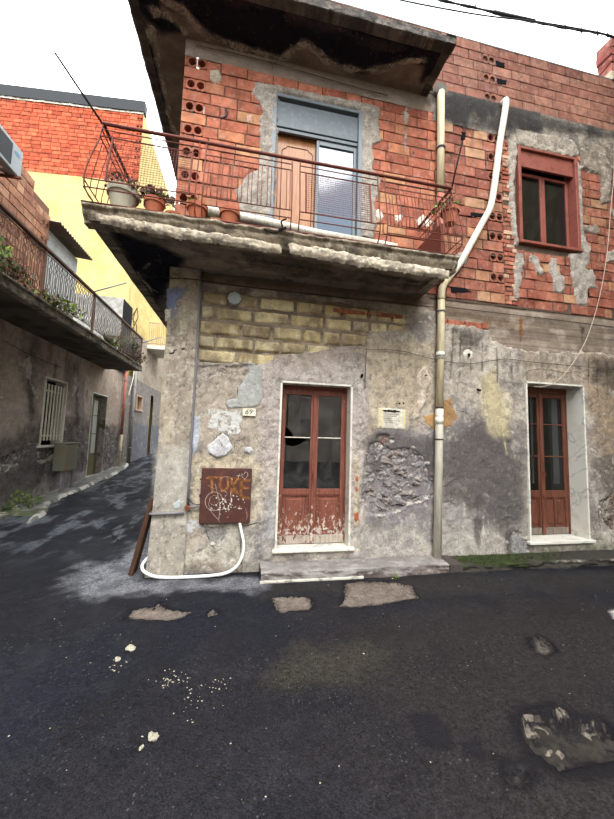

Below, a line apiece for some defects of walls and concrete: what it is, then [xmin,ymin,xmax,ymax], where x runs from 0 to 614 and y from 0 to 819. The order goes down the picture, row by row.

spalling [95,213,471,293]
spalling [197,362,252,387]
spalling [353,434,434,528]
water stain [442,368,525,555]
spalling [597,491,614,534]